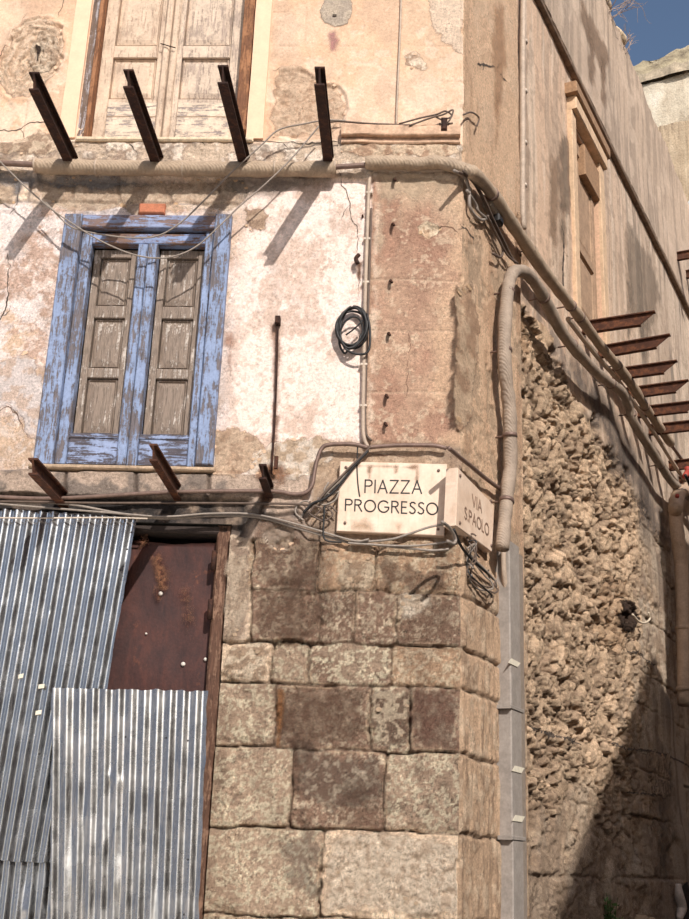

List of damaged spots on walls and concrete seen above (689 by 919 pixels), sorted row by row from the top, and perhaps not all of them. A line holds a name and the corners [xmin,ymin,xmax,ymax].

peeling [428,0,463,54]
spalling [0,15,64,97]
spalling [270,65,320,140]
spalling [327,83,346,132]
peeling [0,130,58,155]
crack [0,254,11,320]
peeling [213,427,335,483]